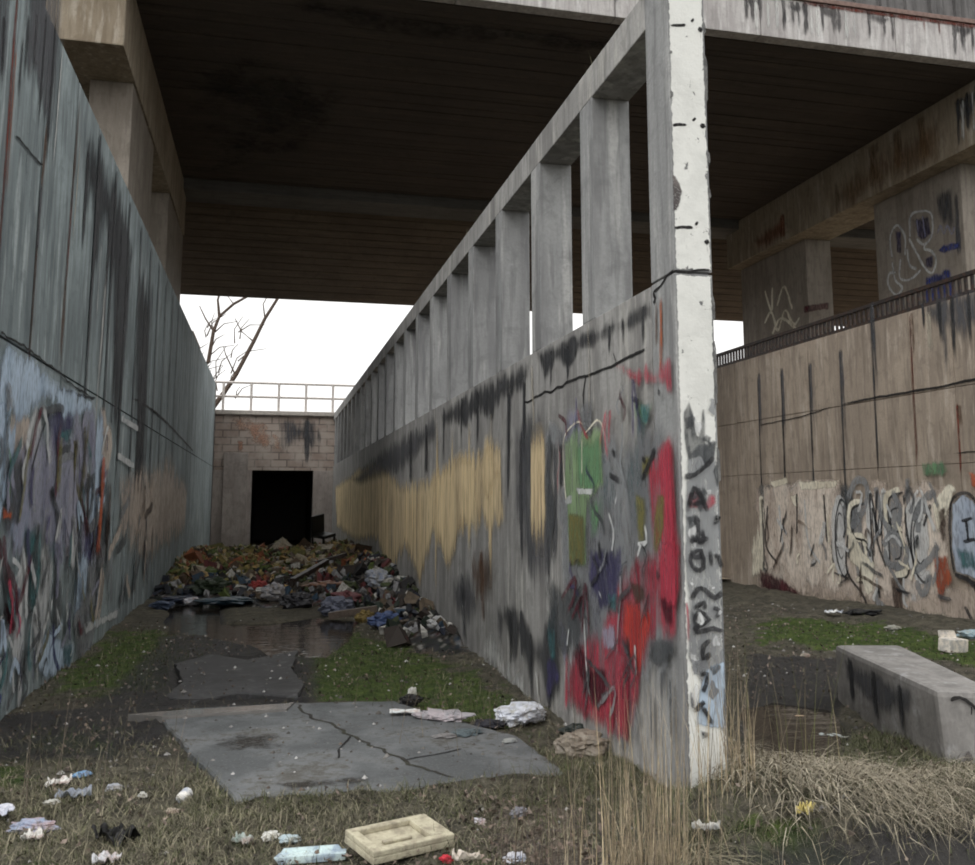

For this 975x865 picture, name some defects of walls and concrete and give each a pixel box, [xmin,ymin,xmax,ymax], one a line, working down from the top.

corrosion [0,0,18,242]
crack [525,349,645,407]
damp [540,305,646,382]
damp [285,419,321,461]
crack [297,705,459,777]
crack [951,696,975,715]